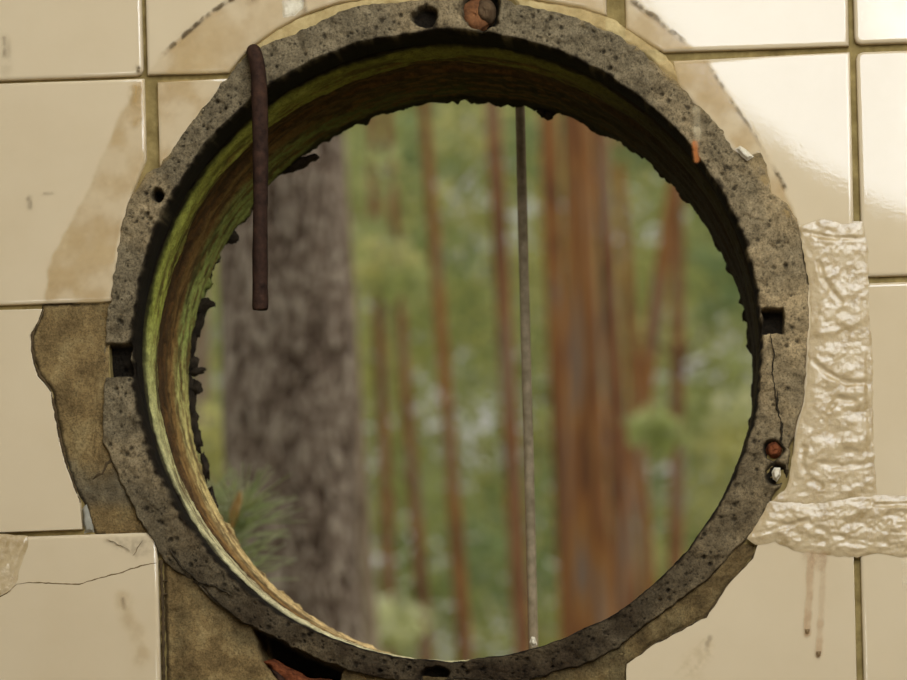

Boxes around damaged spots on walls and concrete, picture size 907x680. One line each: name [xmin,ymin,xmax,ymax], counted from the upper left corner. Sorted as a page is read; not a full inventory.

peeling [282,0,304,18]
peeling [536,108,556,121]
peeling [282,153,320,174]
peeling [736,146,754,161]
peeling [227,231,239,244]
spalling [31,302,147,534]
peeling [188,297,219,508]
crack [770,333,786,449]
crack [0,548,238,616]
spalling [159,560,394,680]
spalling [532,544,755,680]